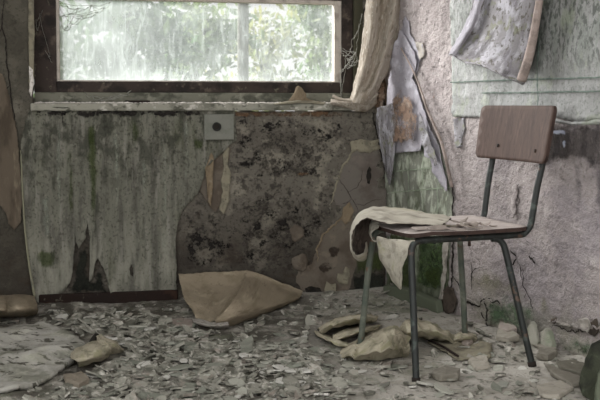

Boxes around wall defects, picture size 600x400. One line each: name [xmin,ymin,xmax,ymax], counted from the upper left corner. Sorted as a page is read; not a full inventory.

crack [0,5,17,129]
water stain [37,111,200,122]
peeling [200,146,231,214]
water stain [237,119,340,177]
crack [372,112,385,170]
peeling [387,16,453,191]
water stain [242,197,323,265]
flaking render [296,139,386,292]
crack [510,251,535,309]